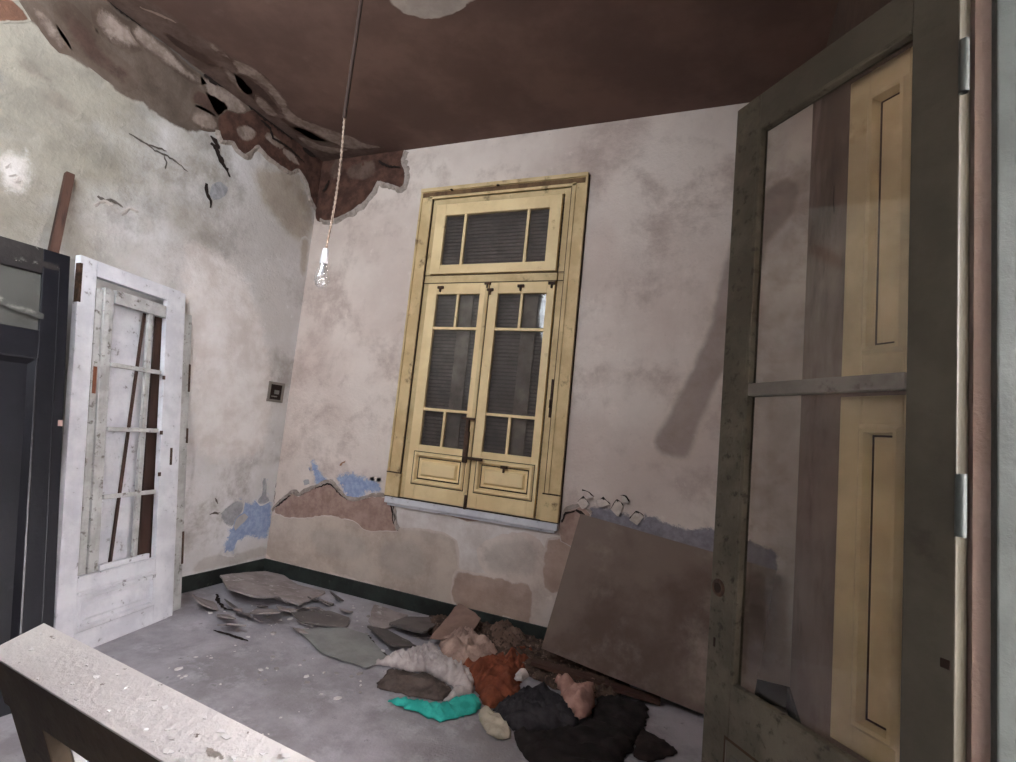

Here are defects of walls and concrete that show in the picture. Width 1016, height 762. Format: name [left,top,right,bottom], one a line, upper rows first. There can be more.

peeling [387,0,478,20]
crack [129,133,231,208]
peeling [0,0,410,225]
water stain [760,173,805,298]
water stain [650,228,731,464]
peeling [190,456,715,628]
peeling [747,535,783,580]